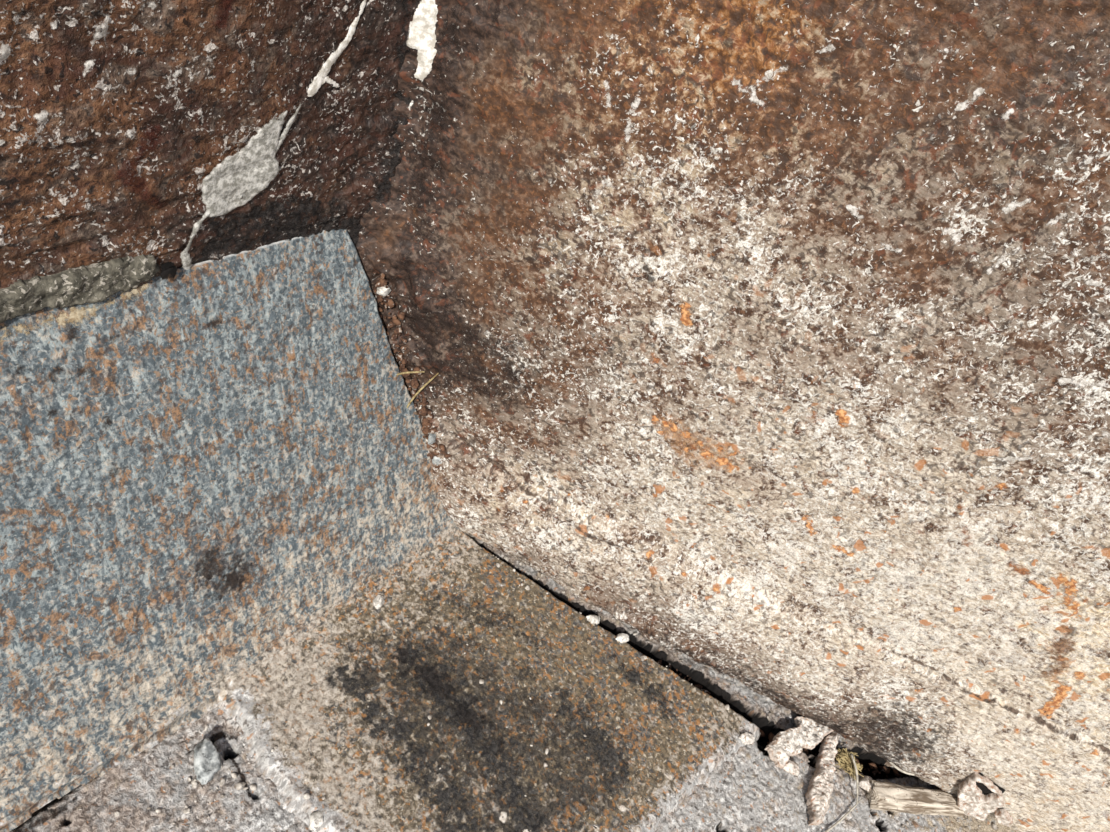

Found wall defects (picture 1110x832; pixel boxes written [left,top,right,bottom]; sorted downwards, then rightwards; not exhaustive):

peeling [0,44,10,61]
peeling [91,15,110,44]
rust [116,126,160,208]
rust [680,302,693,326]
crack [469,536,785,748]
water stain [327,665,495,832]
water stain [394,642,550,832]
peeling [764,716,840,826]
crack [802,742,918,780]
peeling [957,772,1013,827]